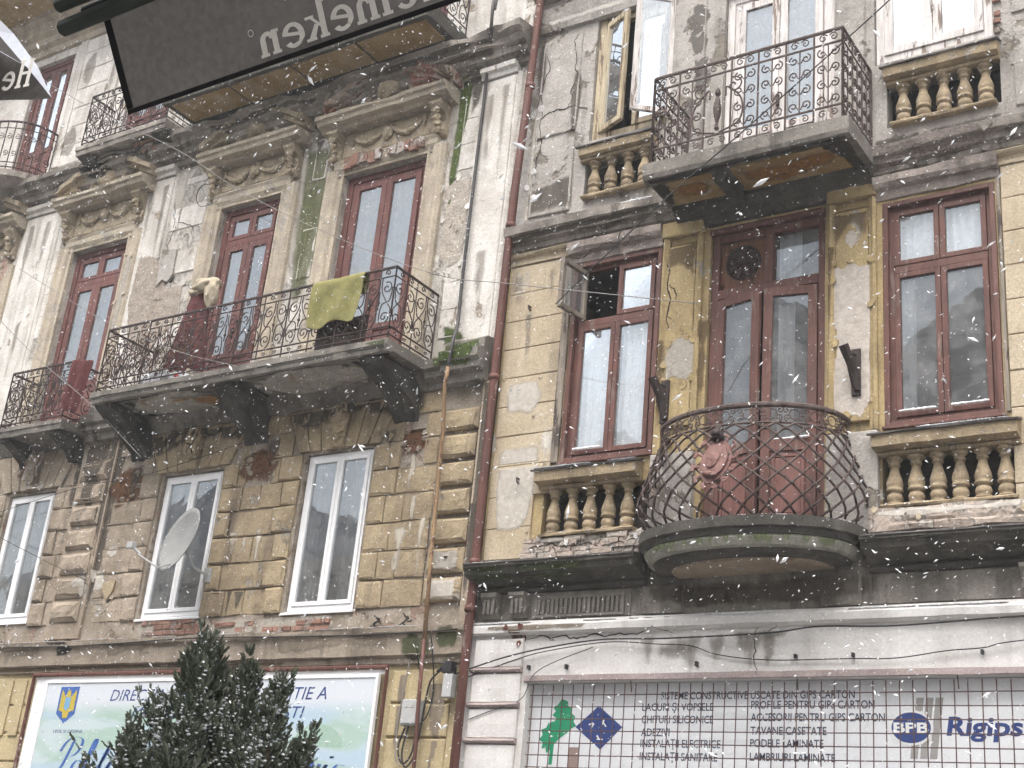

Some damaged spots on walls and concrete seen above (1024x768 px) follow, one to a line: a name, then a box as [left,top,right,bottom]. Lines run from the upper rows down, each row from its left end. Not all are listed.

crack [534,36,588,177]
spalling [684,4,711,115]
crack [666,263,677,328]
flaking render [660,327,696,390]
flaking render [827,230,877,429]
peeling [494,443,642,546]
flaking render [137,615,333,637]